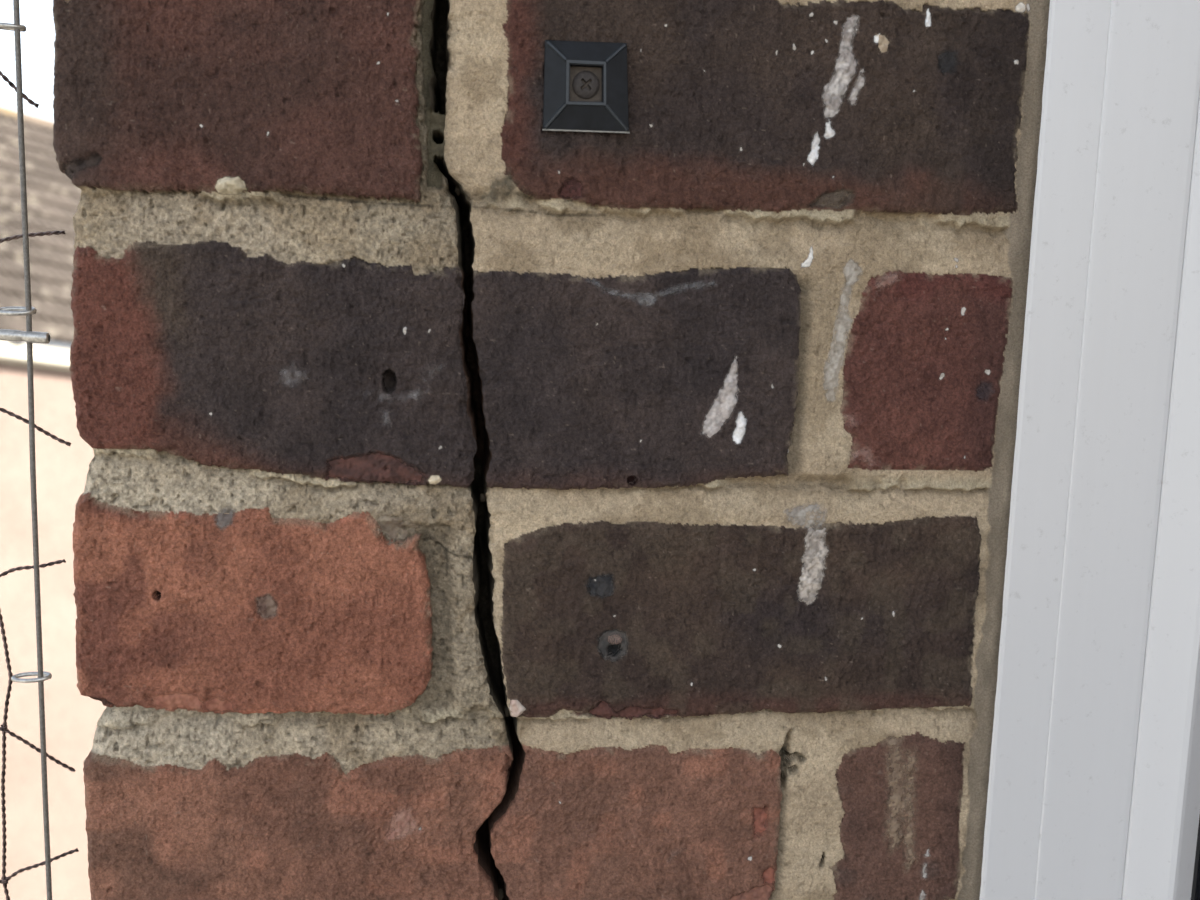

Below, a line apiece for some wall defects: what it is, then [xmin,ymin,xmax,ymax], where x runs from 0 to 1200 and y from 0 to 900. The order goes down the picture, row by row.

crack [287,195,424,207]
crack [429,0,525,900]